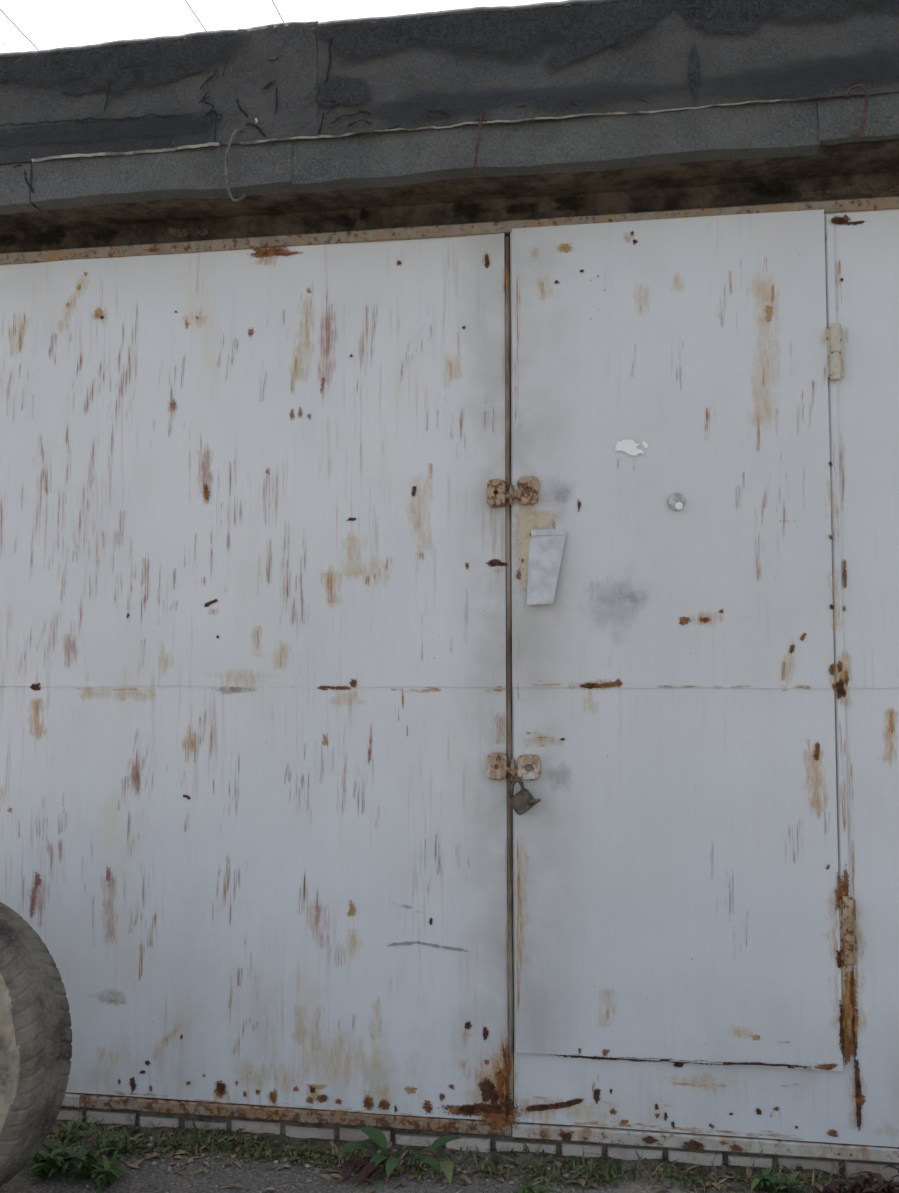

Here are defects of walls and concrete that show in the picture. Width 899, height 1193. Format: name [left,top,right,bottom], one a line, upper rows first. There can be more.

corrosion [247,244,303,261]
peeling [614,439,649,456]
corrosion [678,609,723,625]
corrosion [580,679,622,689]
corrosion [829,660,849,699]
corrosion [826,856,854,909]
corrosion [555,949,865,1130]
corrosion [186,1074,281,1108]
corrosion [294,1039,524,1131]
corrosion [560,1104,798,1154]